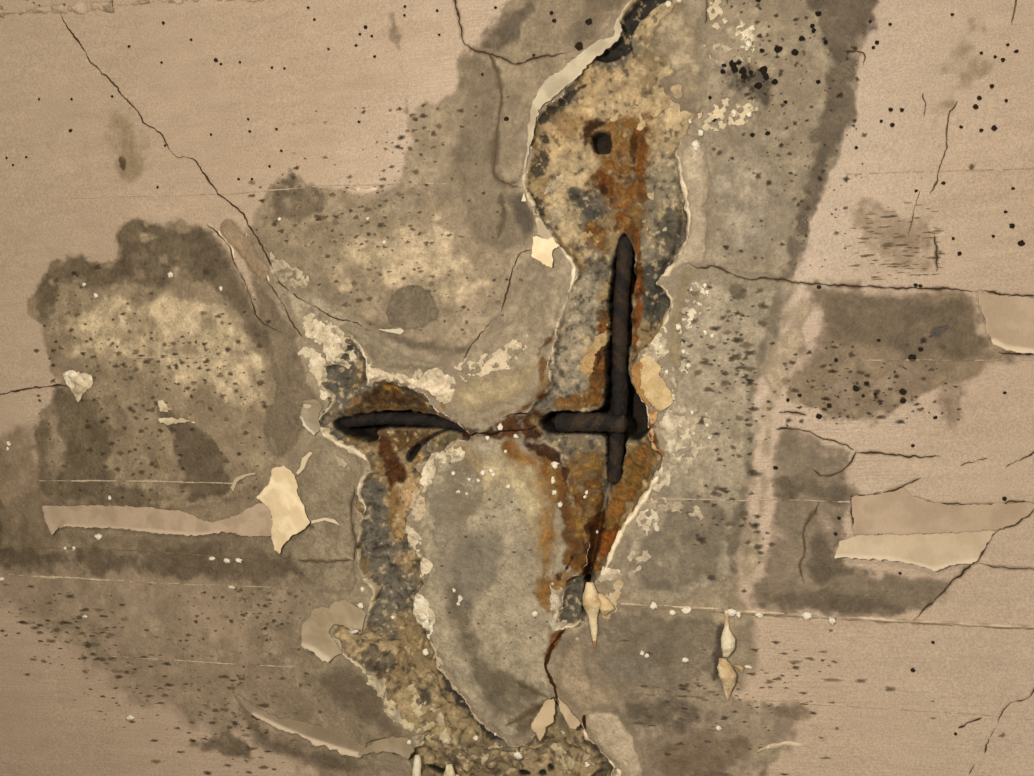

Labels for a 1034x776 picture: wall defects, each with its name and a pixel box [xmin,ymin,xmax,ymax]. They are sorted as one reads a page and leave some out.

crack [33,2,370,339]
corrosion [564,115,650,352]
spalling [521,0,705,632]
crack [689,94,1034,297]
damp [785,283,1001,419]
peeling [42,452,339,554]
corrosion [378,436,407,518]
spalling [230,336,621,776]
corrosion [458,310,664,611]
damp [754,419,948,616]
crack [776,411,1034,620]
damp [242,721,413,776]